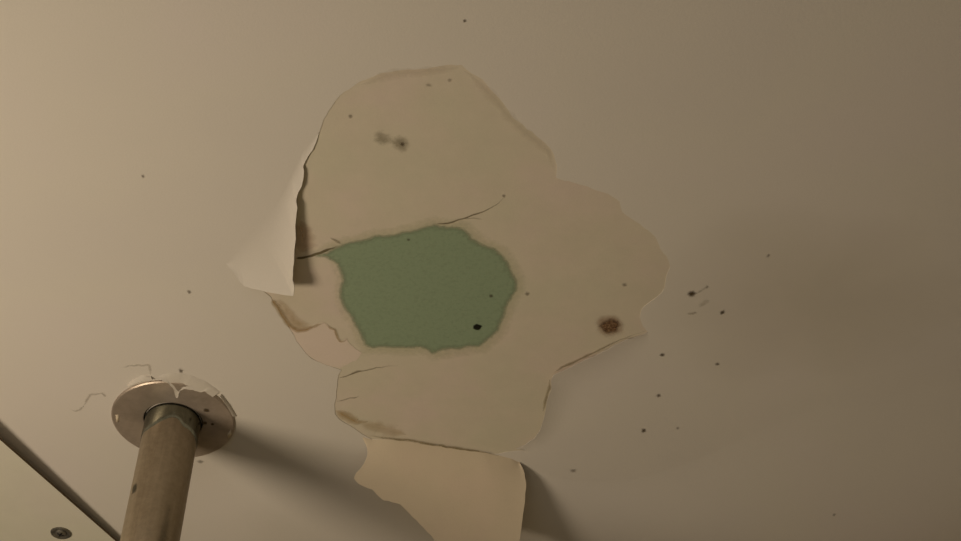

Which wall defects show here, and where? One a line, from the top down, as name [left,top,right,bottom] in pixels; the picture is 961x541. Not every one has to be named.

peeling [226,65,670,541]